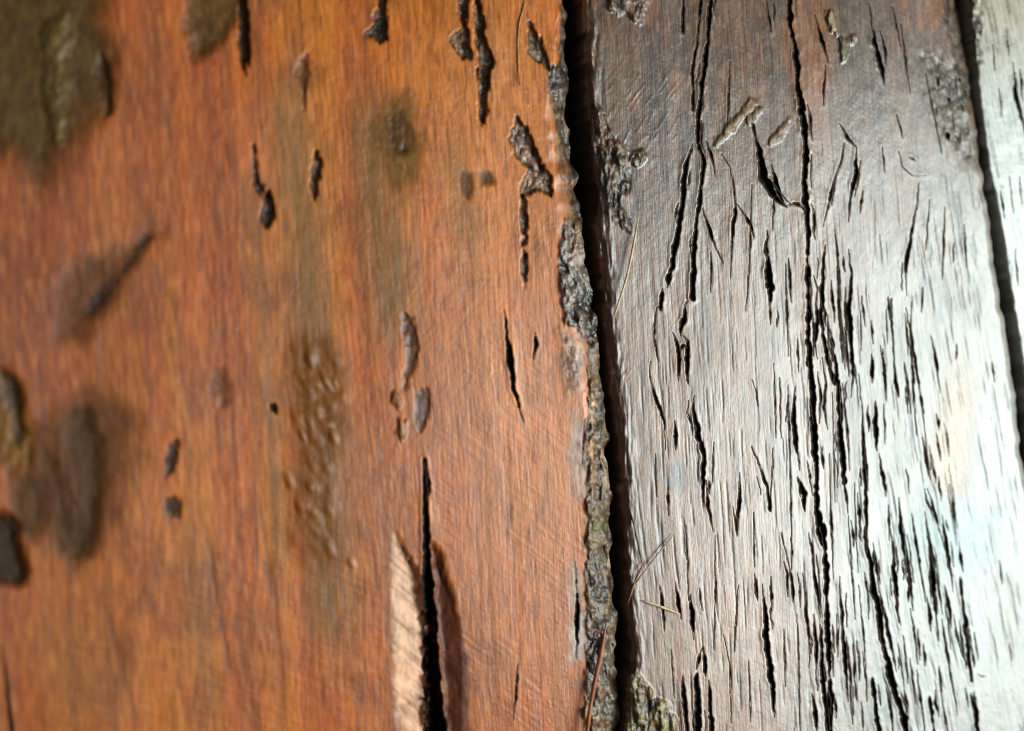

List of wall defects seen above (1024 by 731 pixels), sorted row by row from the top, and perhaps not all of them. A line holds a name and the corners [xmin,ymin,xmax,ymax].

water stain [0,373,129,564]
crack [396,459,446,731]
crack [504,310,538,423]
crack [649,0,985,731]